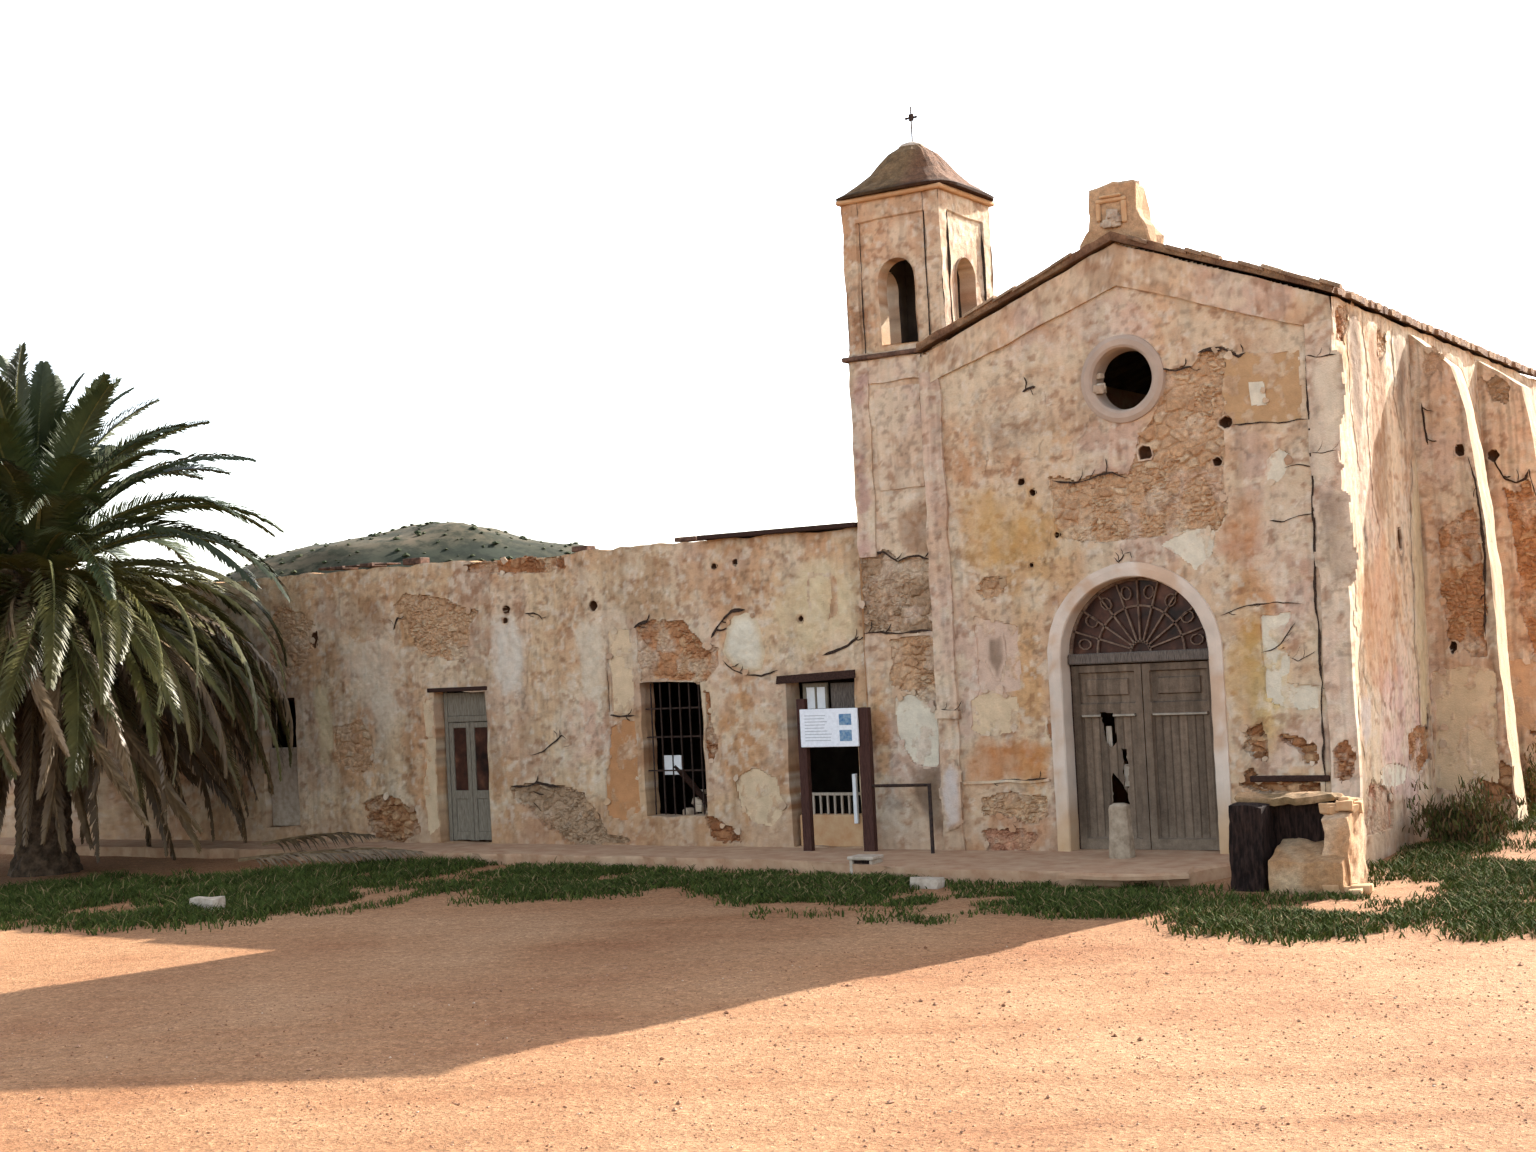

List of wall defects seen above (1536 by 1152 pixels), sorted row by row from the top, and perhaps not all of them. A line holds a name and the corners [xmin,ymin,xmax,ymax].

spalling [1016,345,1302,570]
spalling [266,605,319,678]
spalling [394,593,478,663]
spalling [501,604,511,625]
spalling [587,599,599,613]
spalling [858,549,939,767]
crack [1223,348,1341,792]
flaking render [1239,480,1536,835]
spalling [365,696,441,842]
spalling [511,620,720,845]
flaking render [706,769,787,843]
spalling [982,791,1049,851]